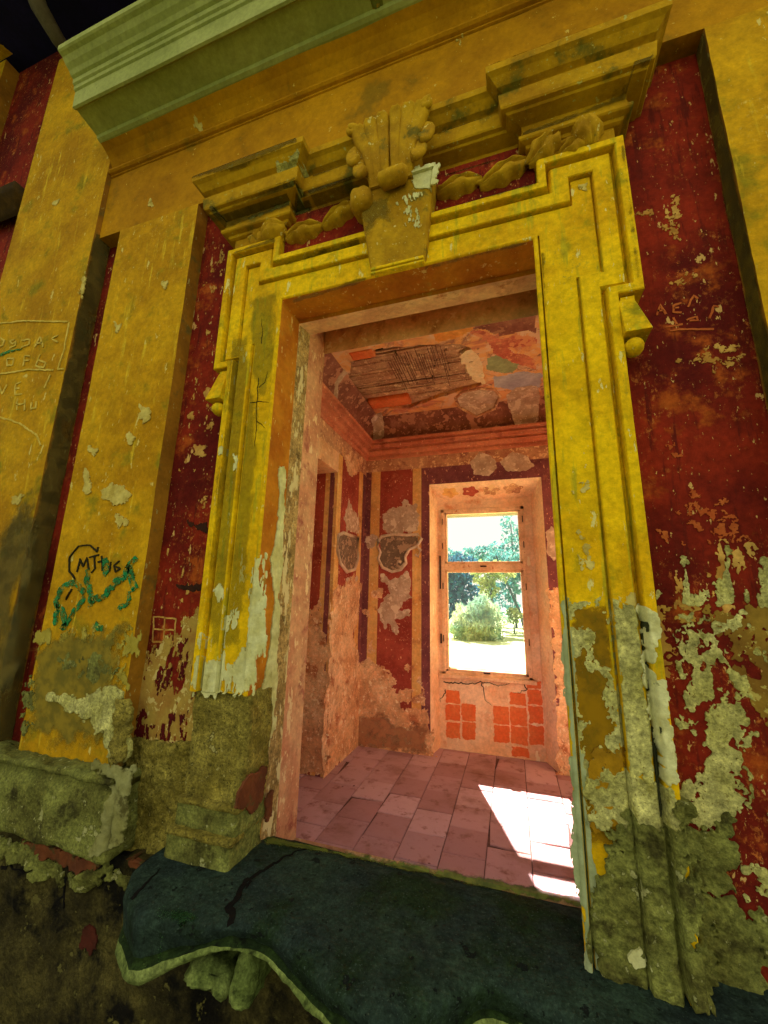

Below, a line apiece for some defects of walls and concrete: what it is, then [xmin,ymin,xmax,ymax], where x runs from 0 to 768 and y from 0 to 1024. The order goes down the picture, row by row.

peeling [635,194,682,241]
flaking render [459,347,486,384]
peeling [675,343,746,374]
peeling [138,404,151,424]
peeling [178,377,238,472]
crack [250,372,268,446]
flaking render [0,466,287,893]
crack [440,681,527,706]
flaking render [493,489,768,1017]